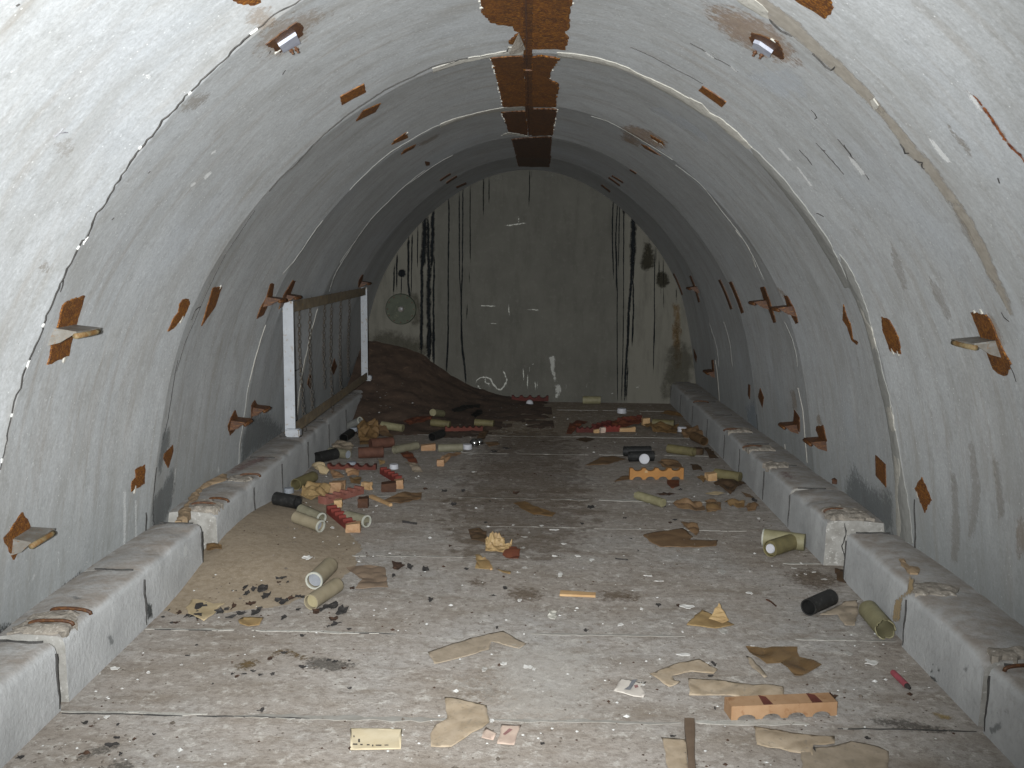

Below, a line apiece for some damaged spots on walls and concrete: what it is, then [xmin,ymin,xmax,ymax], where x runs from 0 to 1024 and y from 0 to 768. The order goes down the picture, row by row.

rust [967,91,1024,162]
leakage [393,179,490,382]
leakage [612,202,677,401]